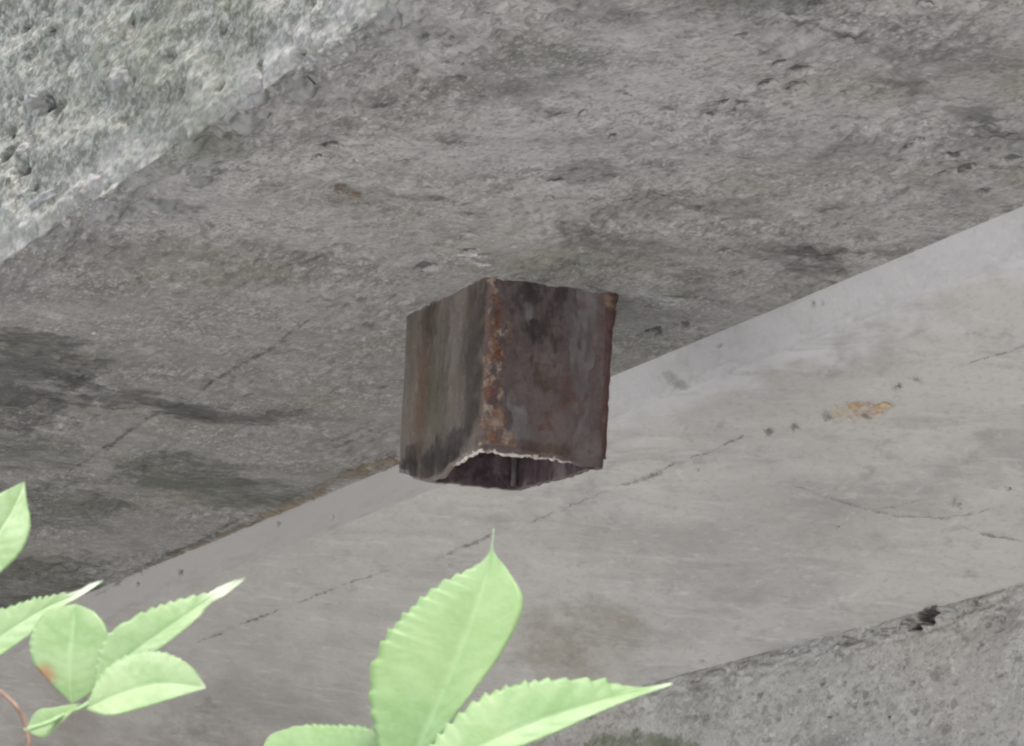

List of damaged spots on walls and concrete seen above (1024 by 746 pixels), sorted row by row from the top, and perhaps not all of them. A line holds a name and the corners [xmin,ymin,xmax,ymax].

water stain [0,312,303,425]
corrosion [165,277,563,558]
water stain [118,451,301,508]
spalling [880,605,940,635]